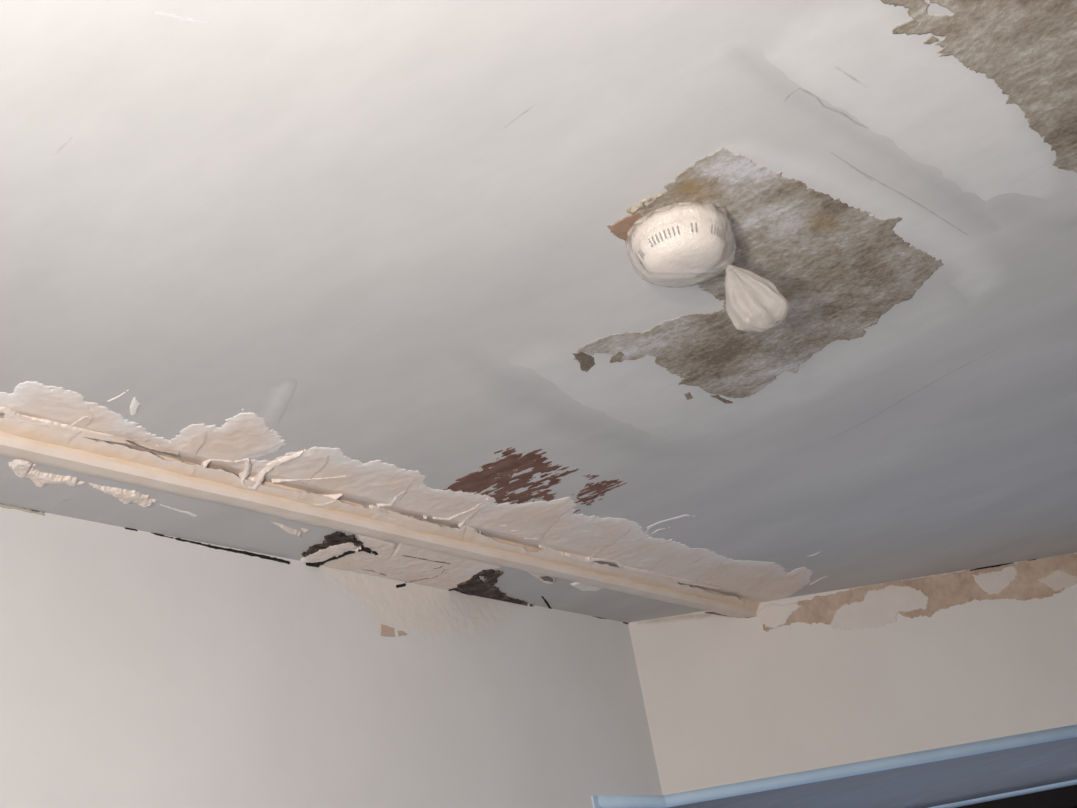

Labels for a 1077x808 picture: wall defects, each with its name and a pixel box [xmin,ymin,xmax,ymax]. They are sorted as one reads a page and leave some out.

peeling [881,0,1077,173]
peeling [572,147,944,404]
peeling [89,483,157,507]
peeling [443,447,626,514]
spalling [300,531,364,563]
spalling [448,569,534,607]